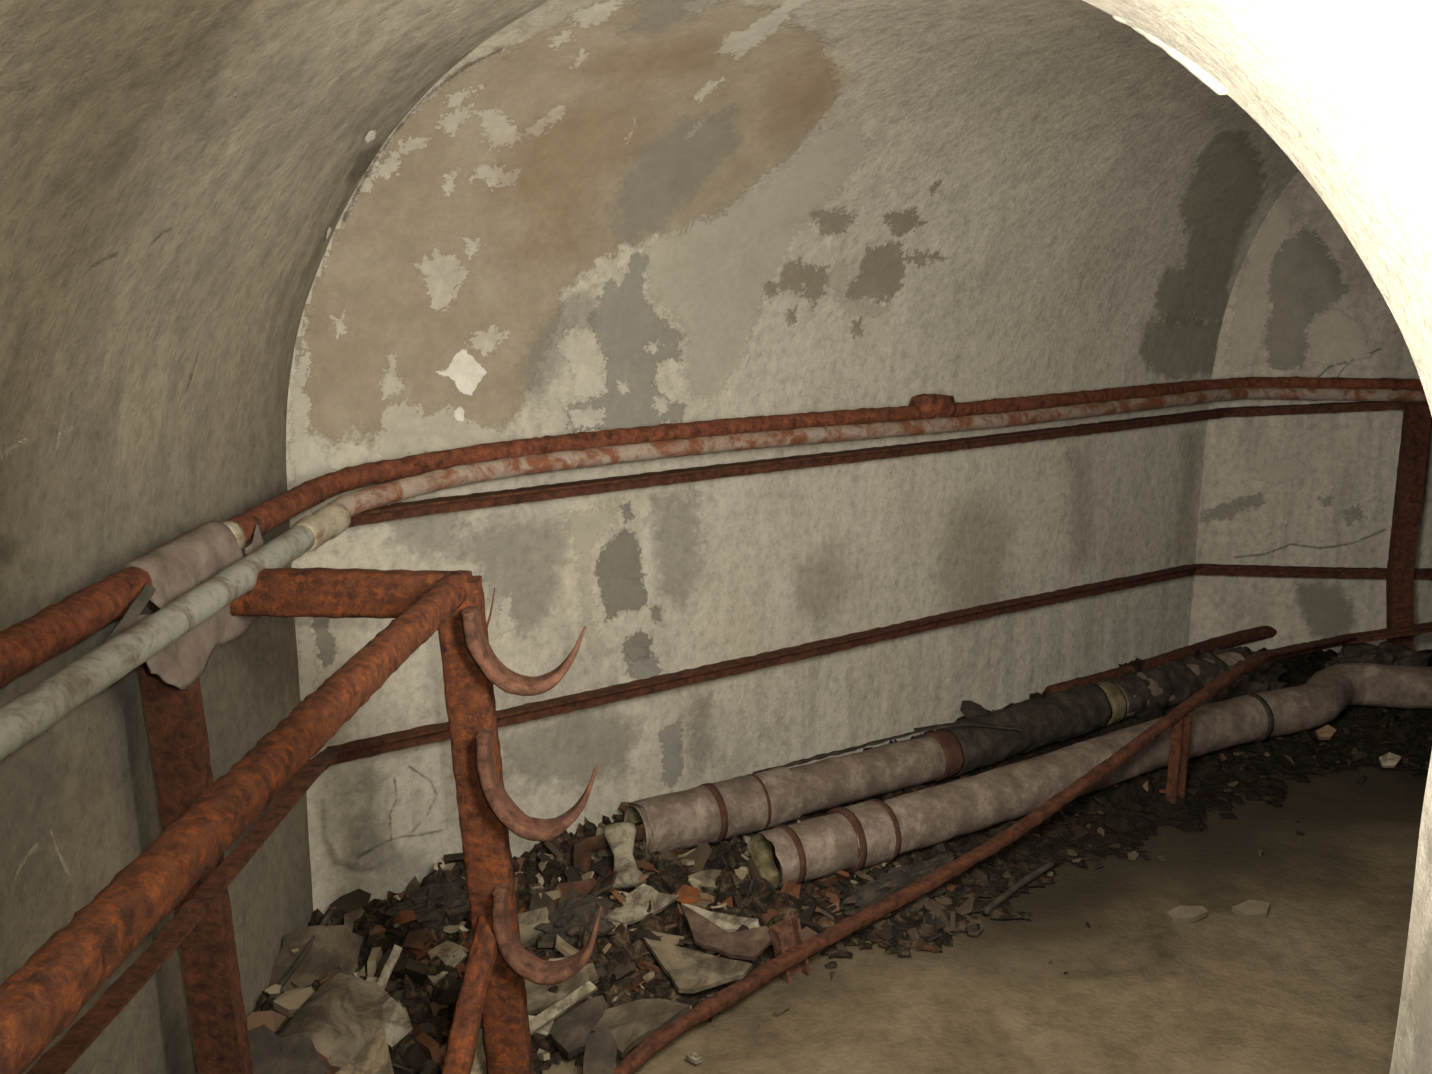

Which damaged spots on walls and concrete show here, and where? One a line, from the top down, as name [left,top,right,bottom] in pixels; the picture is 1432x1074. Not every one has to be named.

peeling [287,0,839,490]
flaking render [764,206,945,339]
damp [1140,132,1267,379]
peeling [296,617,320,701]
flaking render [565,501,661,662]